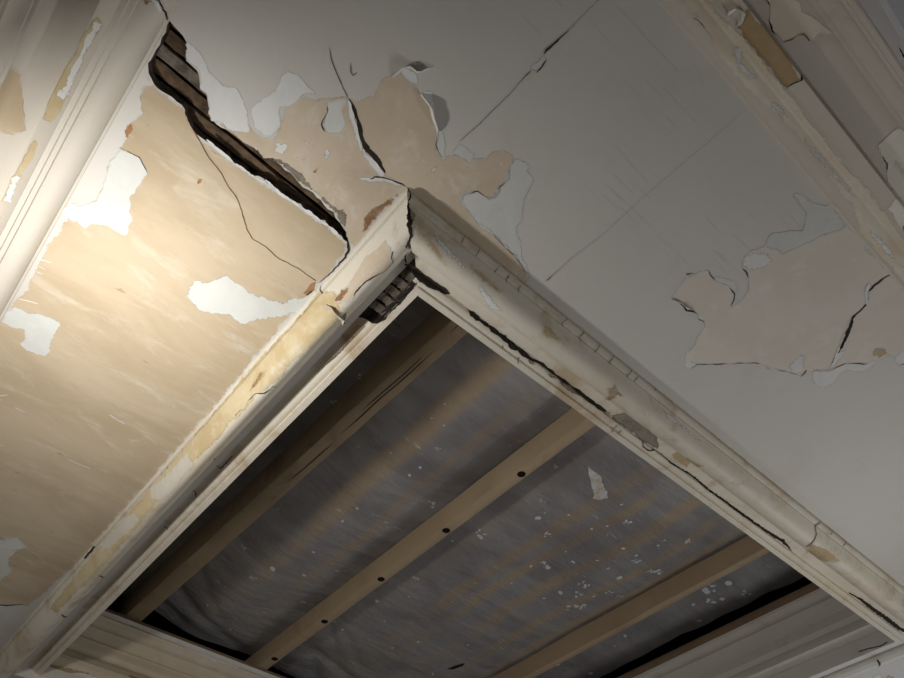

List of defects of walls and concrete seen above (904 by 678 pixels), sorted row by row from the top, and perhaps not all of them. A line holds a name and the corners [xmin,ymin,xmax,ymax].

peeling [43,18,102,122]
crack [144,0,168,20]
crack [461,7,591,140]
peeling [727,0,833,87]
crack [192,129,323,294]
crack [329,48,415,263]
peeling [878,128,904,233]
peeling [0,42,534,612]
peeling [672,193,904,388]
crack [830,275,890,369]